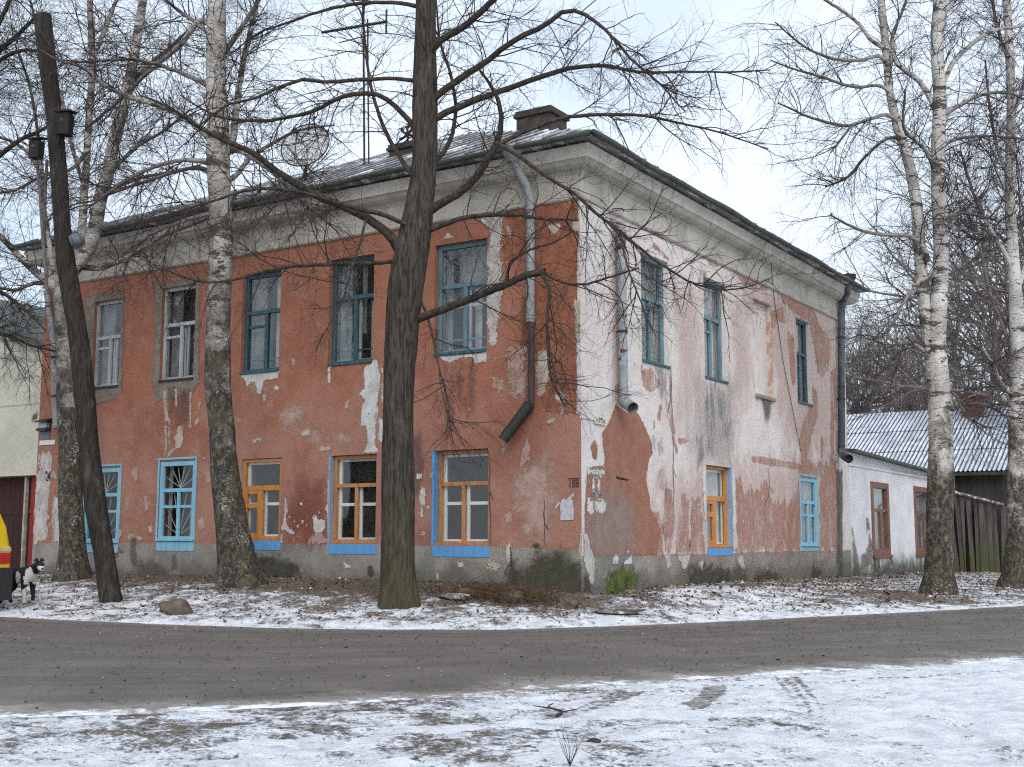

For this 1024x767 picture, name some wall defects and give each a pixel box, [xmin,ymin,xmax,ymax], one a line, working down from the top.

flaking render [440,199,581,424]
peeling [163,388,201,458]
peeling [241,371,279,402]
peeling [345,360,383,453]
peeling [642,367,687,453]
flaking render [732,274,838,570]
flaking render [33,451,59,546]
flaking render [280,488,330,547]
peeling [586,440,629,515]
flaking render [653,465,707,570]
leakage [506,553,582,593]